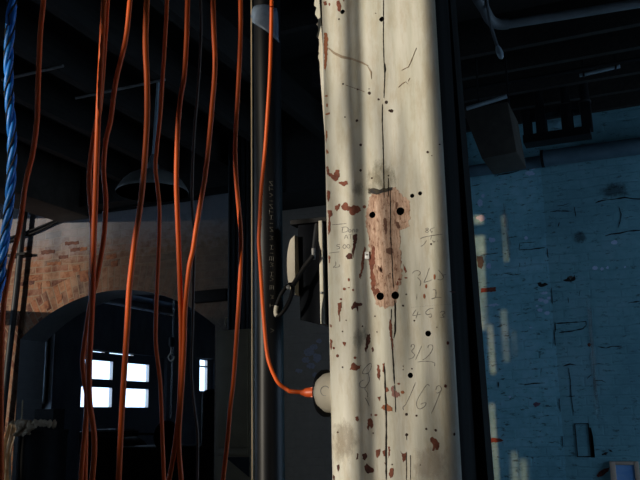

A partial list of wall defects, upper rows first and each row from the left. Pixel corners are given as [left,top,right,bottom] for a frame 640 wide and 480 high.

crack [383,0,416,88]
spalling [327,187,411,309]
crack [382,104,396,478]
crack [554,321,587,345]
crack [559,363,575,412]